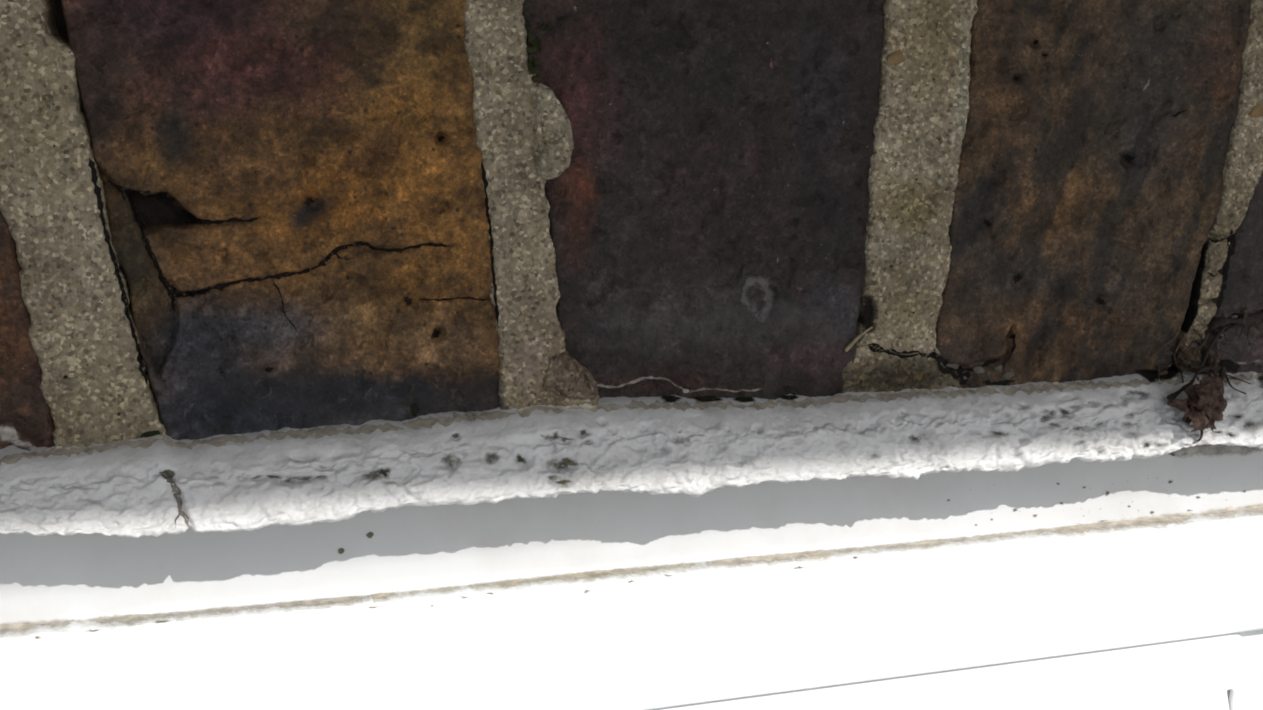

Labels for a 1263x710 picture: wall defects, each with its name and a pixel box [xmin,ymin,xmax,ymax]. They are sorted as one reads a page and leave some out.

spalling [107,179,204,305]
crack [180,209,260,225]
crack [170,241,452,333]
crack [868,337,1016,386]
crack [159,470,190,527]